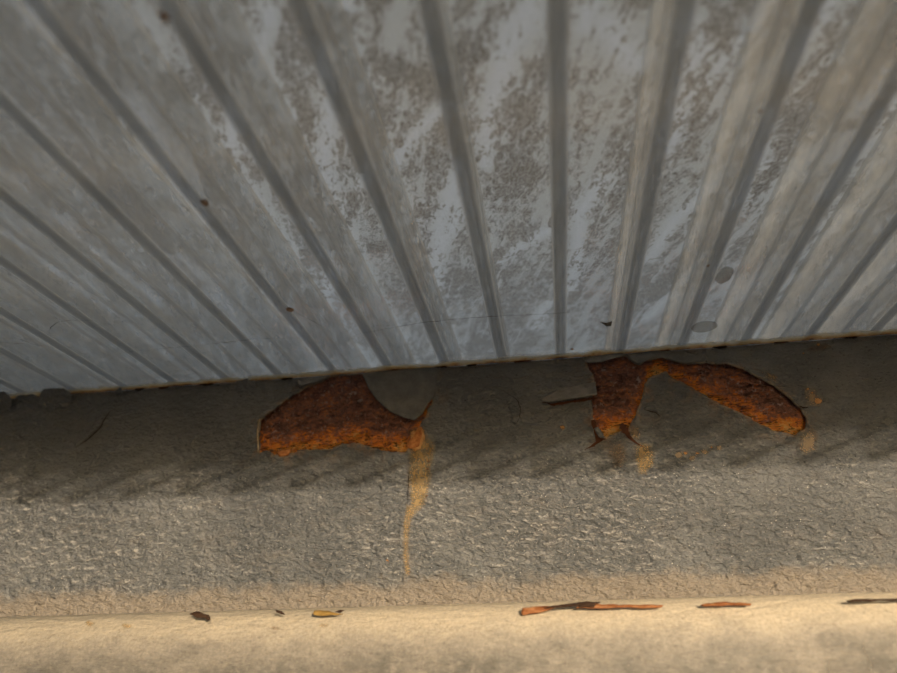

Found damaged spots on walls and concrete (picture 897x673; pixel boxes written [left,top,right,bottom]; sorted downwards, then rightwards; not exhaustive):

corrosion [66,328,897,508]